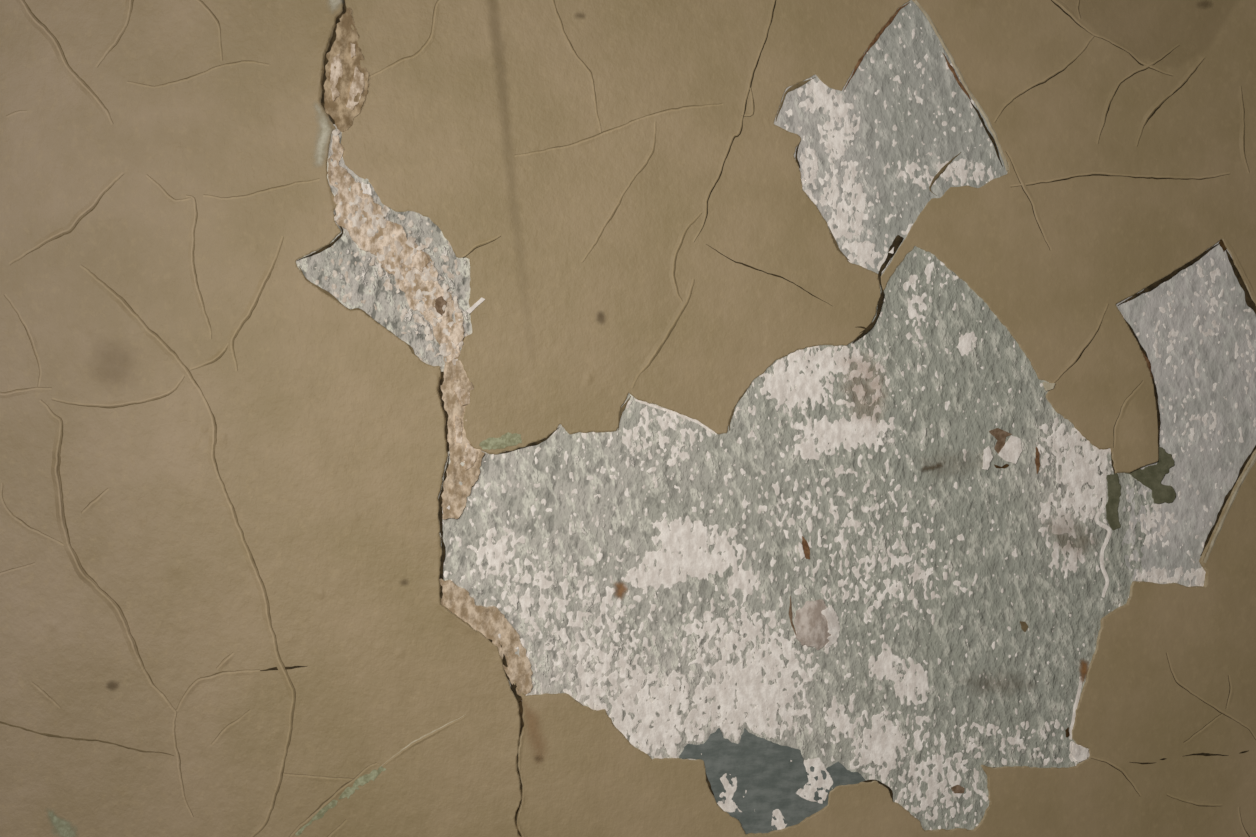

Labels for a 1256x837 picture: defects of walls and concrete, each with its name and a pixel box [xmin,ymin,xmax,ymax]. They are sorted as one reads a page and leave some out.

crack [0,0,444,837]
spalling [296,124,485,372]
crack [438,357,485,520]
crack [461,233,501,258]
crack [514,0,832,388]
peeling [438,0,1256,834]
crack [852,235,904,344]
crack [1049,303,1109,383]
crack [992,0,1250,251]
crack [515,701,524,836]